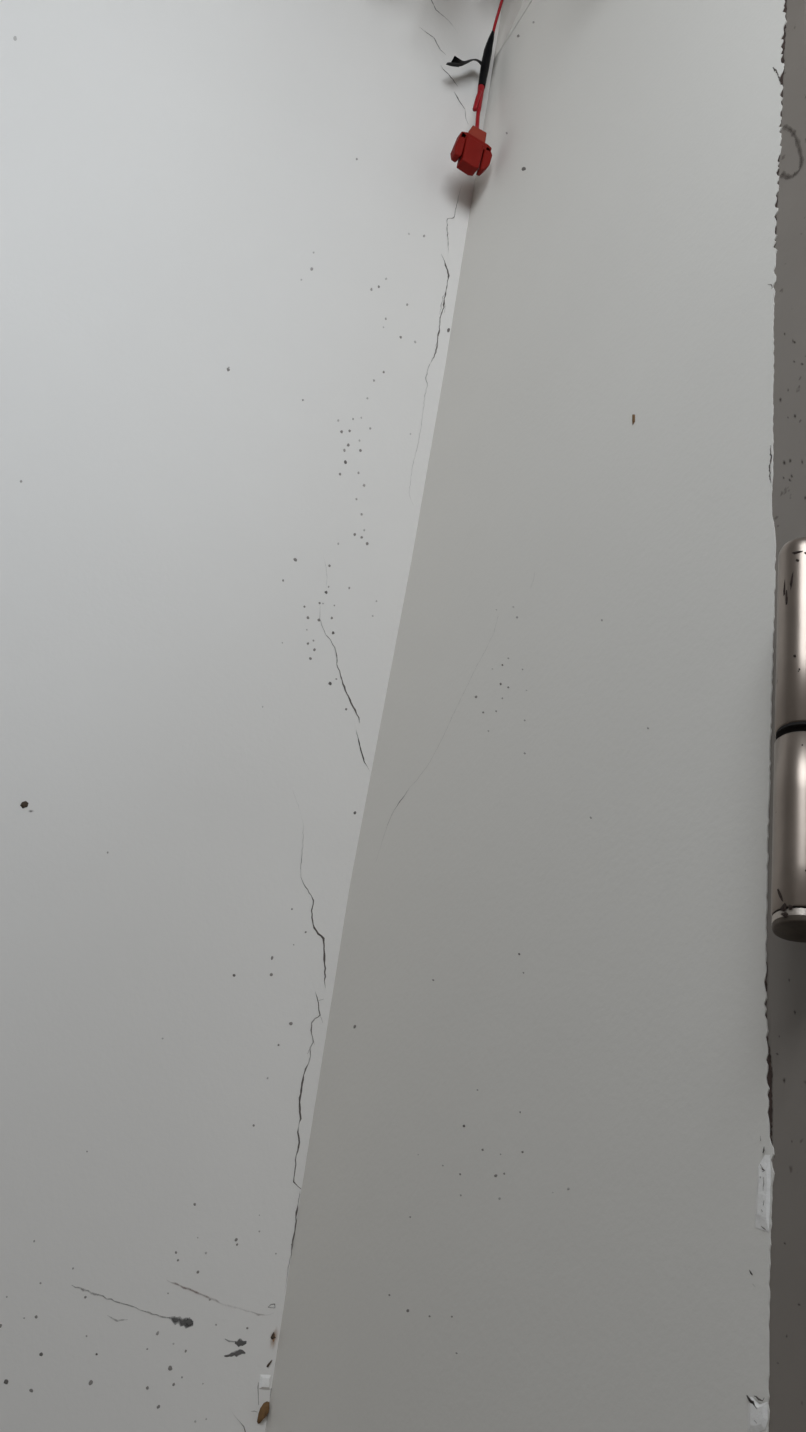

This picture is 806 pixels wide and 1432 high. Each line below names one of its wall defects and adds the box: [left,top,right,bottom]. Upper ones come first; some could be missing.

crack [426,202,458,382]
crack [322,626,367,766]
crack [288,858,326,1267]